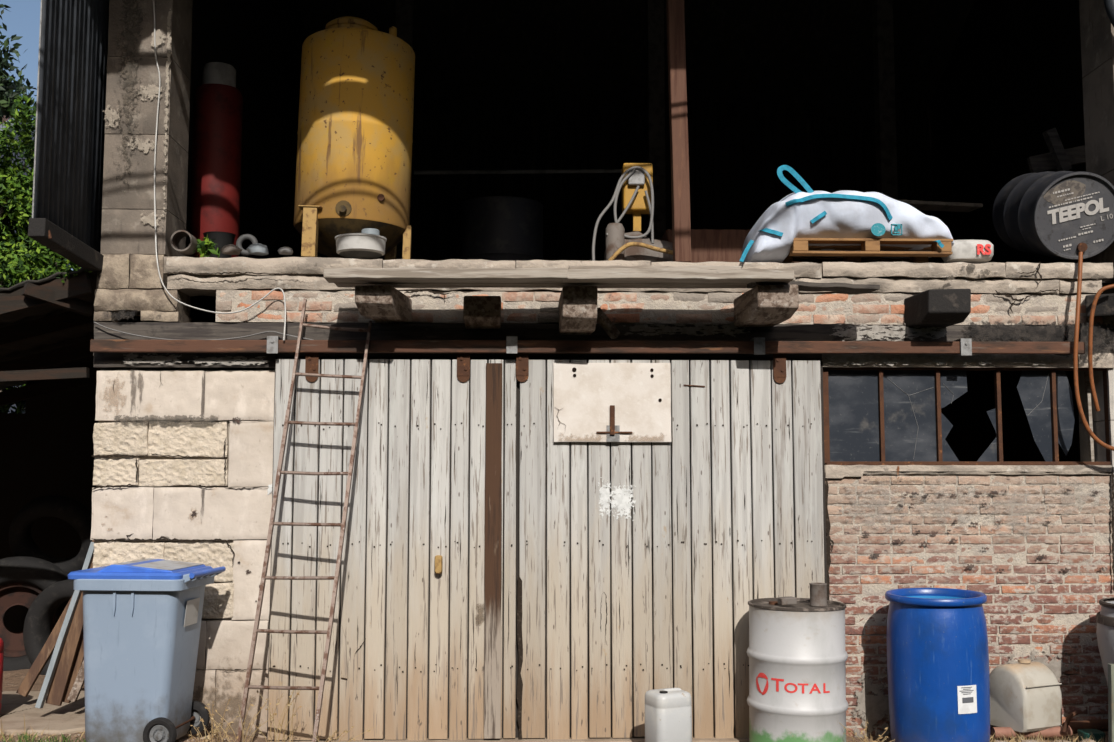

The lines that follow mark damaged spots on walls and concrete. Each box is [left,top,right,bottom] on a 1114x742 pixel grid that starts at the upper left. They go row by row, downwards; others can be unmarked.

leakage [115,0,146,192]
leakage [162,9,173,217]
crack [995,263,1067,313]
peeling [598,477,636,521]
spalling [897,490,1006,508]
spalling [892,520,980,546]
peeling [1004,649,1079,685]
peeling [852,672,890,738]